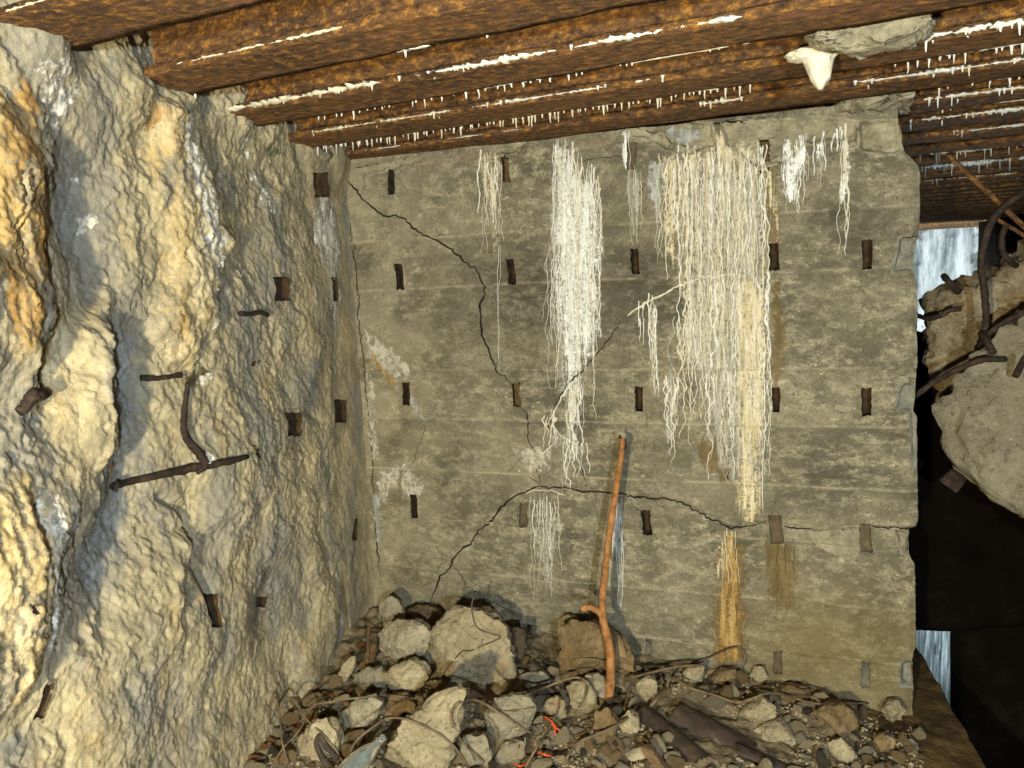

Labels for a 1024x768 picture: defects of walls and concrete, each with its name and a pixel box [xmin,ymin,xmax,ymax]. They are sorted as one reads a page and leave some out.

efflorescence [417,50,556,79]
efflorescence [312,72,751,156]
efflorescence [569,29,660,50]
efflorescence [697,14,742,25]
efflorescence [364,329,425,547]
crack [348,157,556,584]
efflorescence [477,150,504,342]
efflorescence [513,138,604,598]
crack [419,274,910,625]
efflorescence [621,123,851,525]
rust [712,528,746,662]
rust [765,543,797,616]